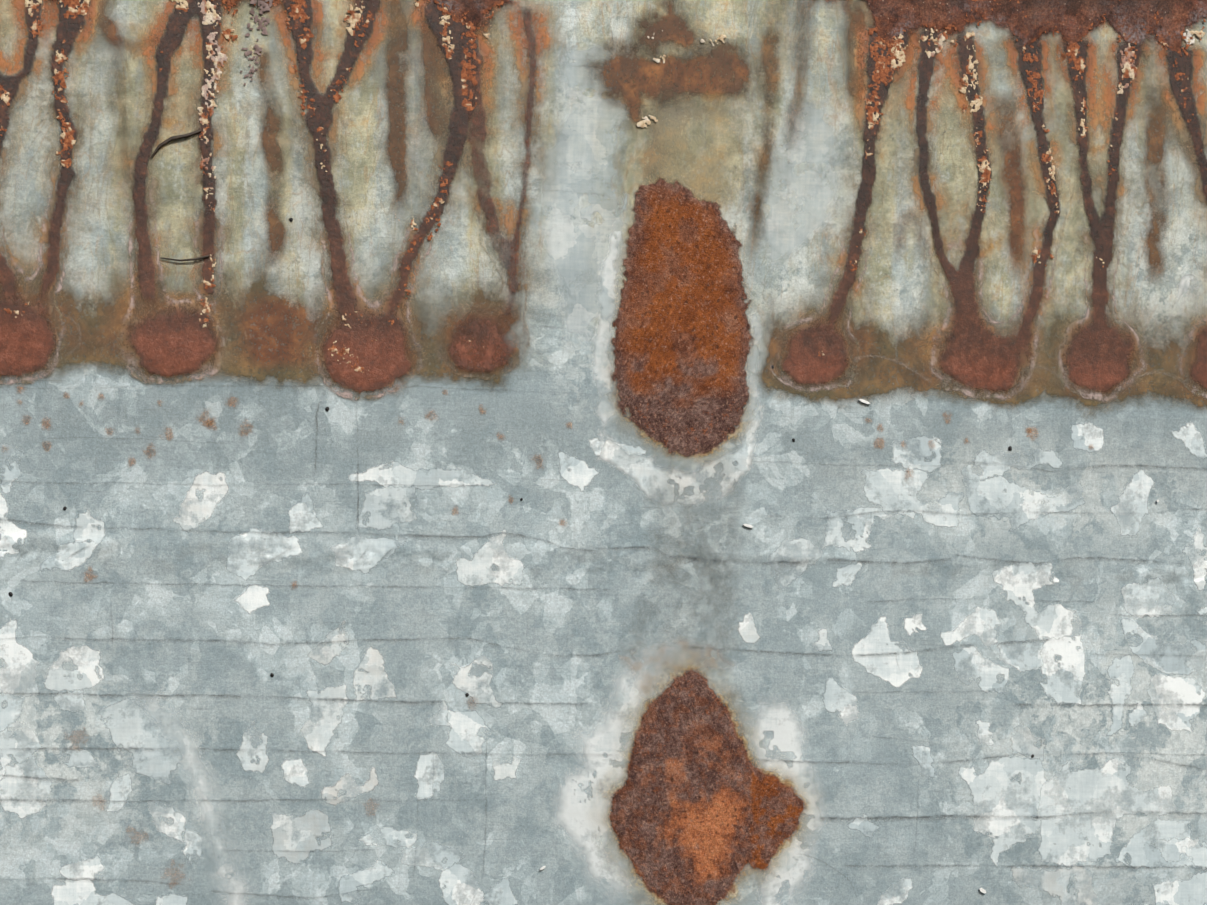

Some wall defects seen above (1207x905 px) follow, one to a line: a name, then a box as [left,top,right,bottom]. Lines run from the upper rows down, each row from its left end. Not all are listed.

corrosion [0,0,554,400]
corrosion [611,178,754,458]
corrosion [593,0,780,233]
corrosion [771,0,1207,402]
corrosion [608,665,807,905]